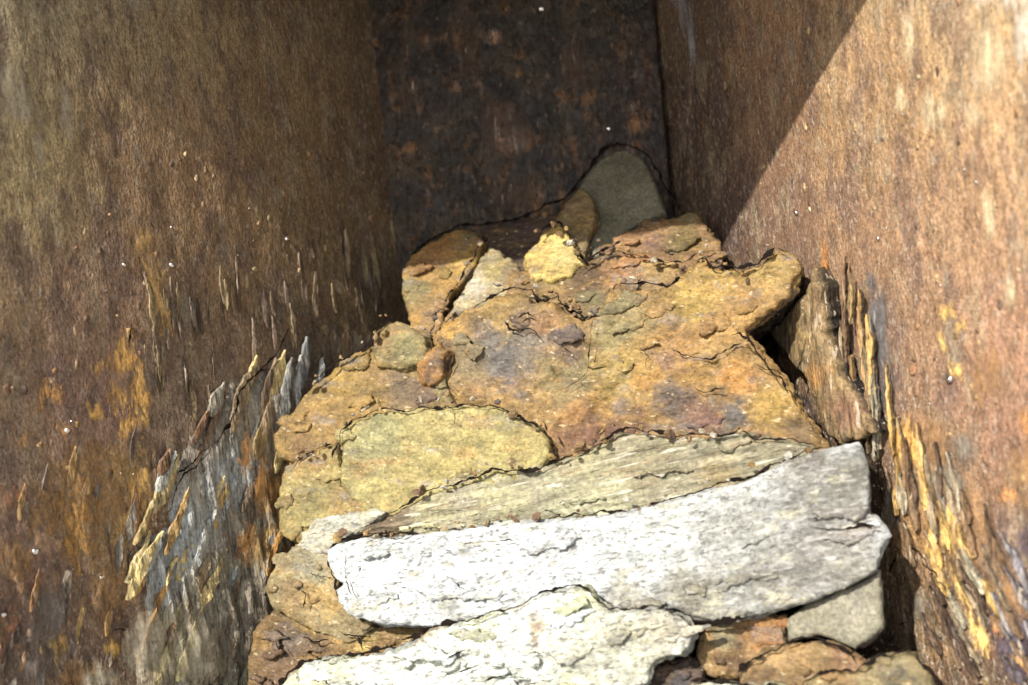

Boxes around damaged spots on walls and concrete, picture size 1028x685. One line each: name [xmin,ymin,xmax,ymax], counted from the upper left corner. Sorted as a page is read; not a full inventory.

rust [933,302,1006,404]
rust [0,204,381,685]
peeling [276,404,312,433]
rust [895,405,954,472]
rust [998,405,1028,502]
peeling [274,494,294,510]
peeling [272,520,314,565]
rust [918,509,954,569]
peeling [260,629,289,660]
peeling [748,615,788,665]
peeling [876,656,891,666]
rust [968,577,1028,674]